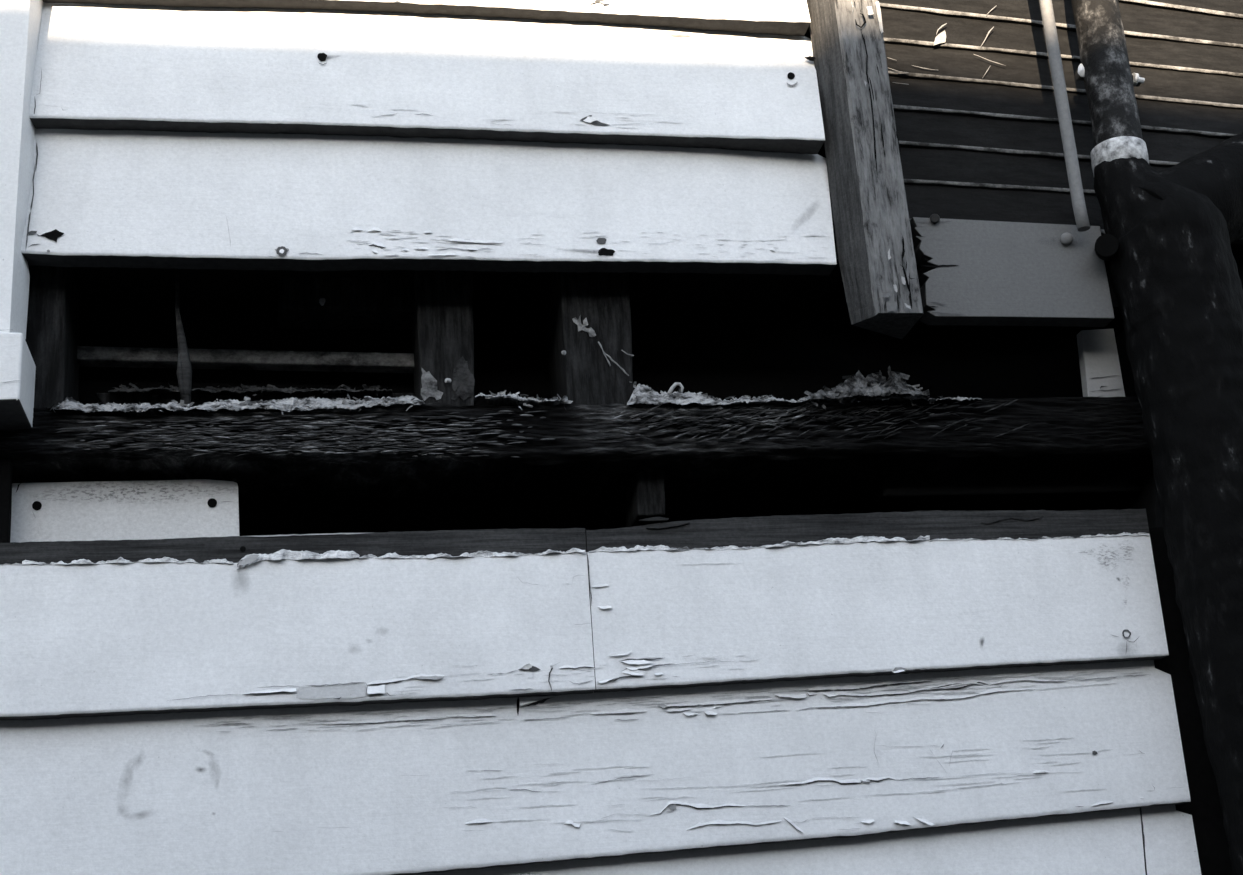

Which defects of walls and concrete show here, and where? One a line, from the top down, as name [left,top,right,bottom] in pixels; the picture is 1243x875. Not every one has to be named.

peeling [0,510,1149,570]
peeling [506,664,541,674]
peeling [599,650,734,683]
peeling [168,682,411,701]
peeling [513,688,552,707]